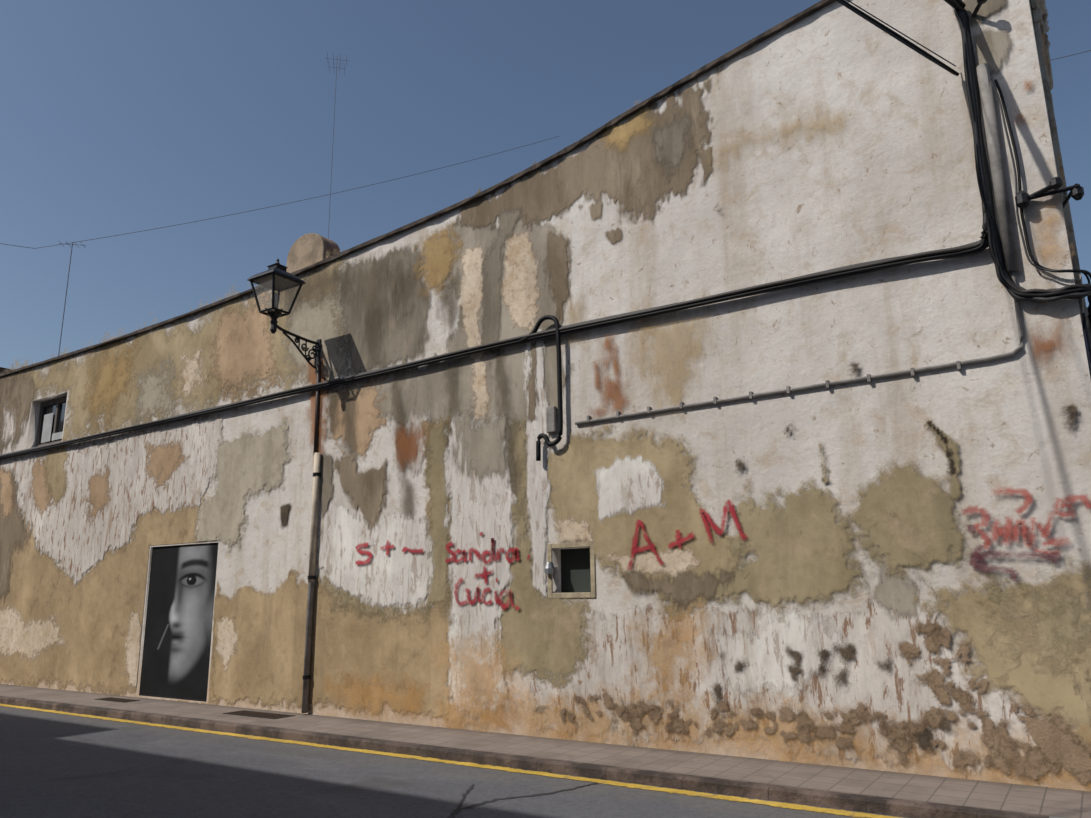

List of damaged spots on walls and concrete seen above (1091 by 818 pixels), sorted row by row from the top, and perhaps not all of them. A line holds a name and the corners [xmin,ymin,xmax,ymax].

flaking render [456,69,718,244]
damp [0,377,31,599]
flaking render [0,257,351,696]
flaking render [161,415,452,719]
rust [594,337,626,415]
peeling [530,424,1091,784]